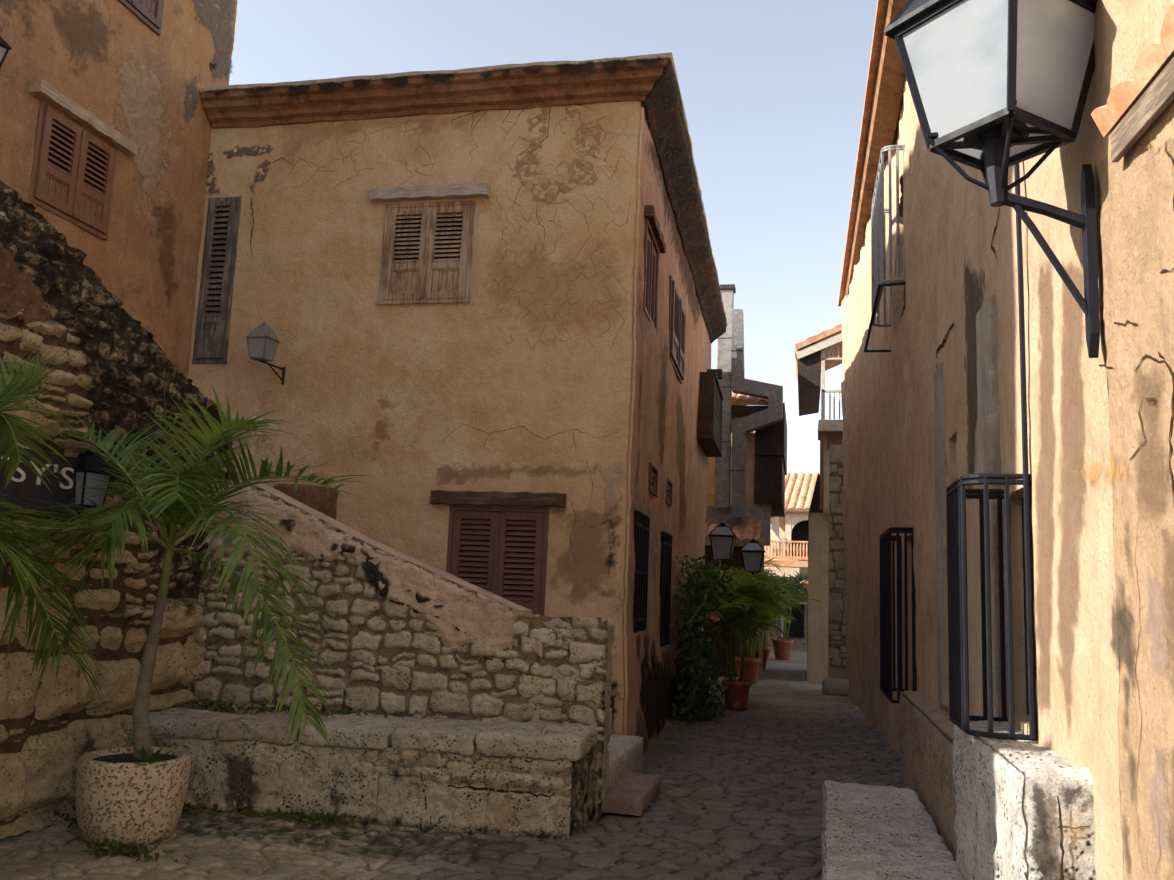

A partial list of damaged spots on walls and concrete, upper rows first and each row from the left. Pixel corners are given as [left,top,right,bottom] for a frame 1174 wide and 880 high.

damp [55,3,107,62]
flaking render [193,0,236,79]
flaking render [182,77,198,129]
flaking render [205,145,273,195]
crack [273,105,632,352]
crack [1114,319,1137,327]
crack [1099,352,1174,503]